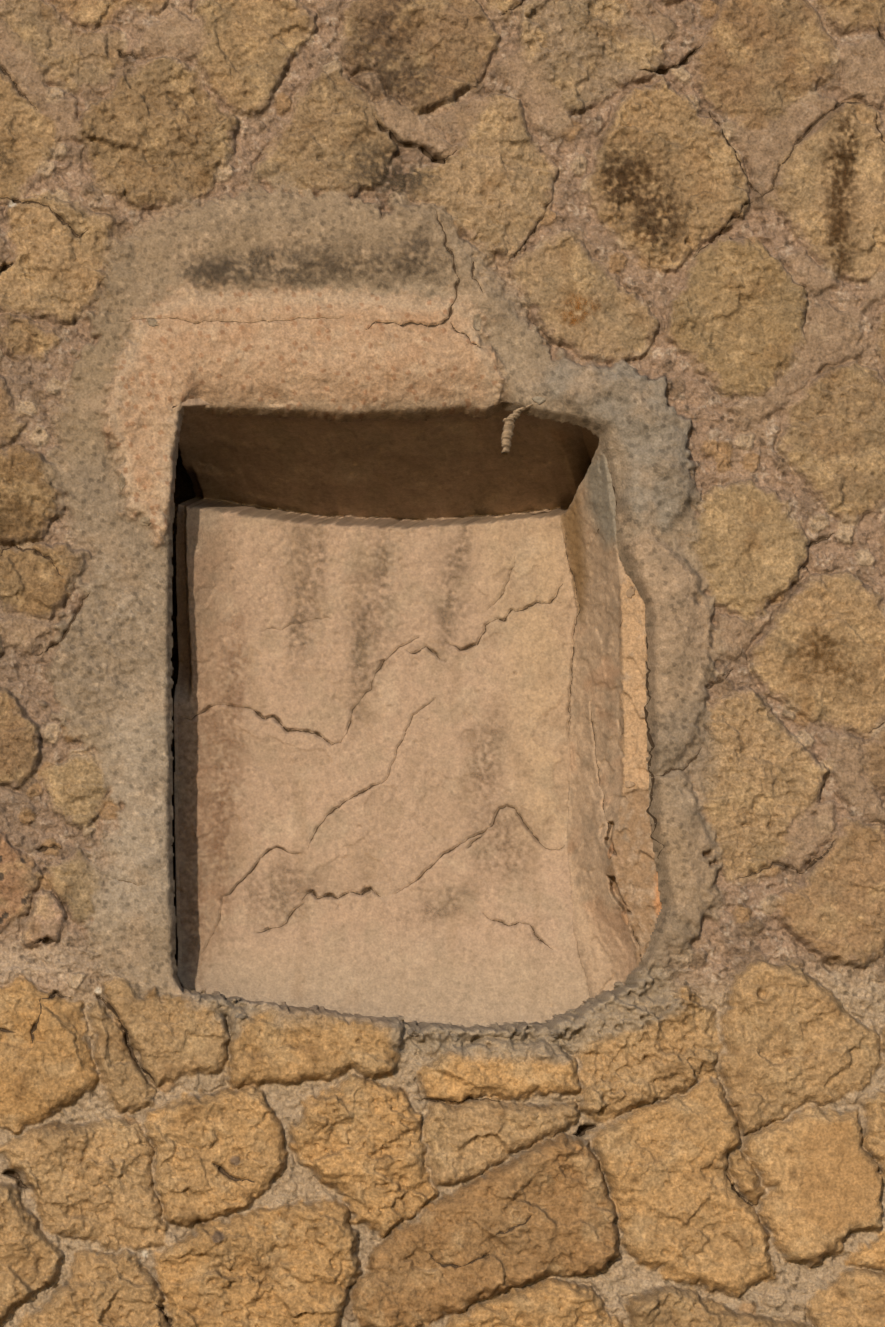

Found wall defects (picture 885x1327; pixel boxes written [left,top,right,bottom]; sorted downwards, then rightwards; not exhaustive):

water stain [604,150,677,242]
water stain [827,118,858,272]
crack [186,485,617,828]
crack [202,701,432,953]
crack [257,806,565,933]
crack [488,918,553,950]